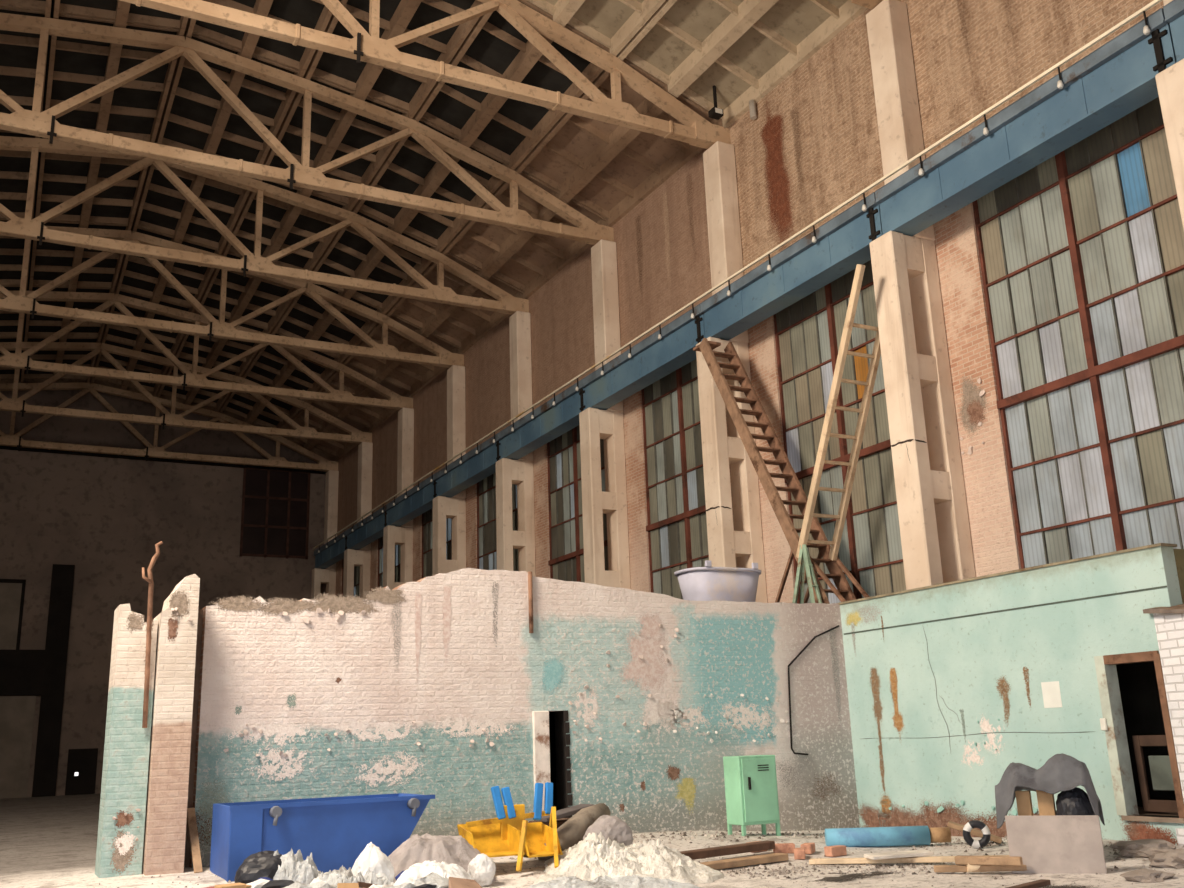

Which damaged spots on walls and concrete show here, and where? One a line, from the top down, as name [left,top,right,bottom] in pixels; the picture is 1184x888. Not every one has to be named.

water stain [759,98,807,250]
peeling [217,711,524,792]
rust [869,667,904,818]
crack [923,628,1081,750]
rust [996,667,1034,729]
spalling [195,770,232,859]